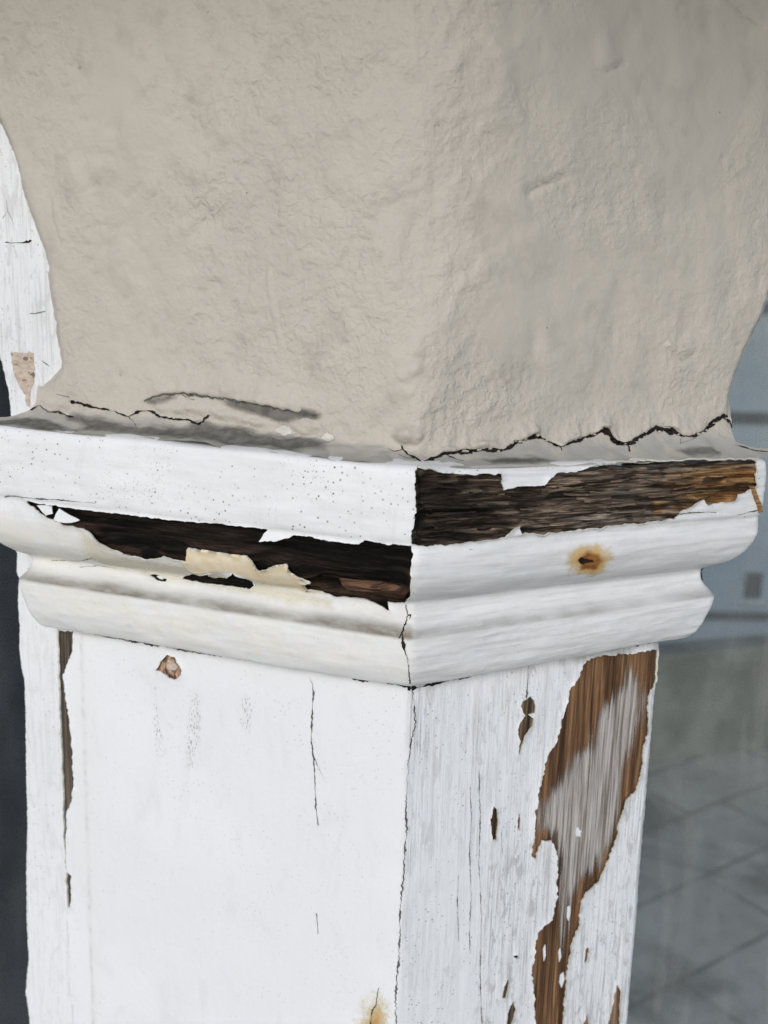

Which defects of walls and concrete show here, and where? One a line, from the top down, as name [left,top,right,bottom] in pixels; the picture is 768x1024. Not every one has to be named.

crack [30,360,317,426]
crack [390,399,768,461]
peeling [37,505,79,523]
peeling [182,549,322,593]
rust [571,546,611,574]
crack [94,634,220,657]
peeling [60,631,74,812]
crack [310,680,323,825]
peeling [518,697,535,753]
crack [352,604,469,1024]
peeling [532,649,657,1024]
rust [362,1005,383,1024]